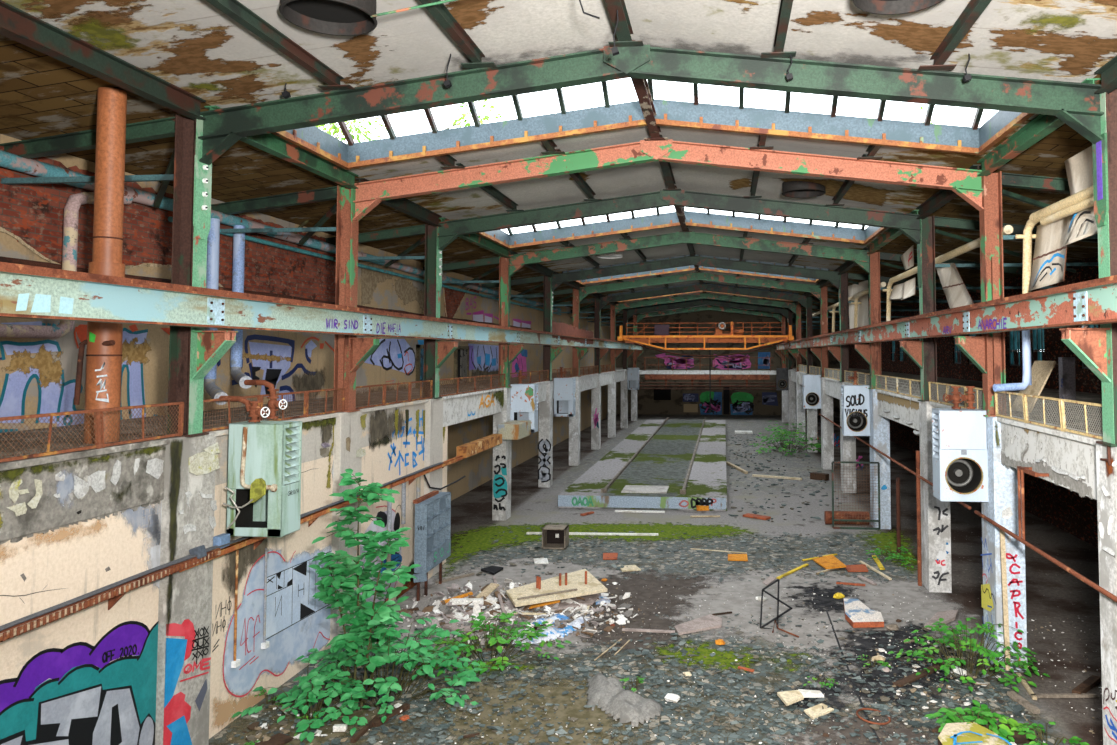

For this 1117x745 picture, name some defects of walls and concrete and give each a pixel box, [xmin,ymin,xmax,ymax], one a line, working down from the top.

flaking render [21,0,151,30]
flaking render [144,24,281,104]
flaking render [331,35,398,87]
flaking render [444,0,504,30]
flaking render [791,11,953,55]
flaking render [953,23,975,52]
flaking render [989,28,1117,79]
peeling [189,442,221,476]
peeling [1001,435,1111,499]
peeling [0,458,164,545]
peeling [179,491,217,534]
peeling [1098,515,1115,558]